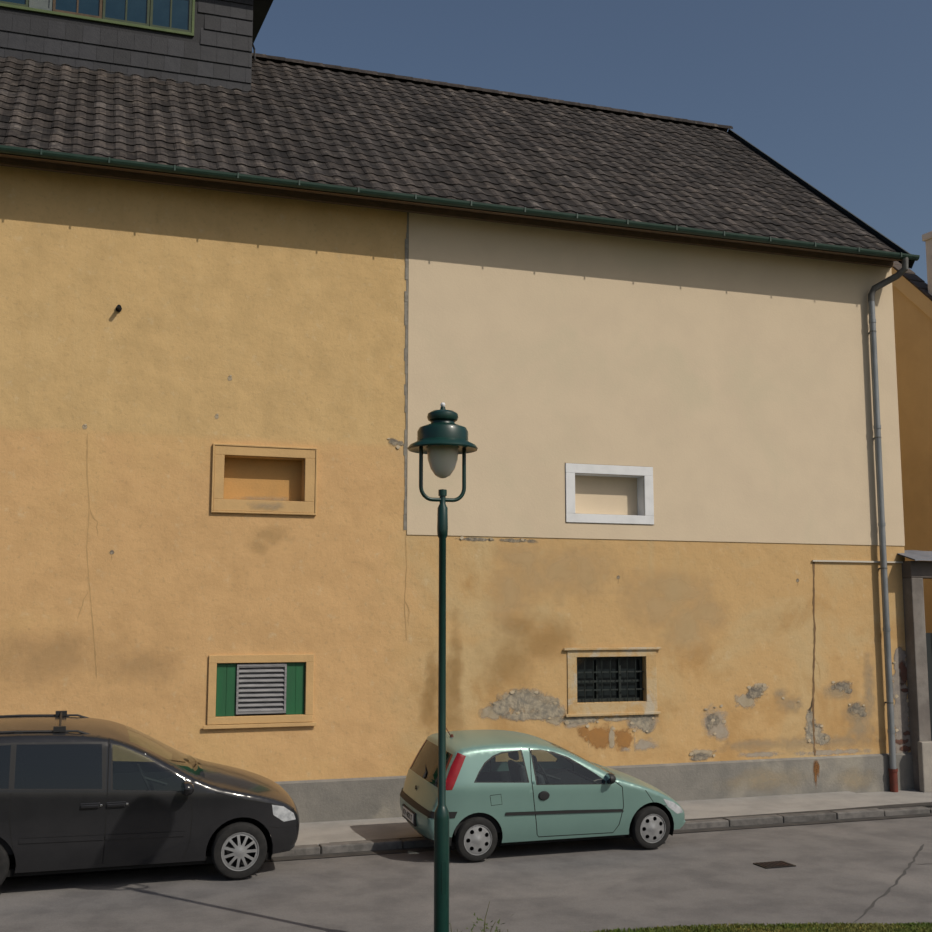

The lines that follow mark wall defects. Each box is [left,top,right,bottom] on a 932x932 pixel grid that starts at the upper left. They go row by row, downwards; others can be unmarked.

crack [78,434,98,678]
crack [808,562,820,755]
spalling [481,689,655,750]
spalling [704,704,728,738]
spalling [735,683,768,708]
spalling [805,711,830,745]
spalling [831,681,867,717]
spalling [892,647,911,753]